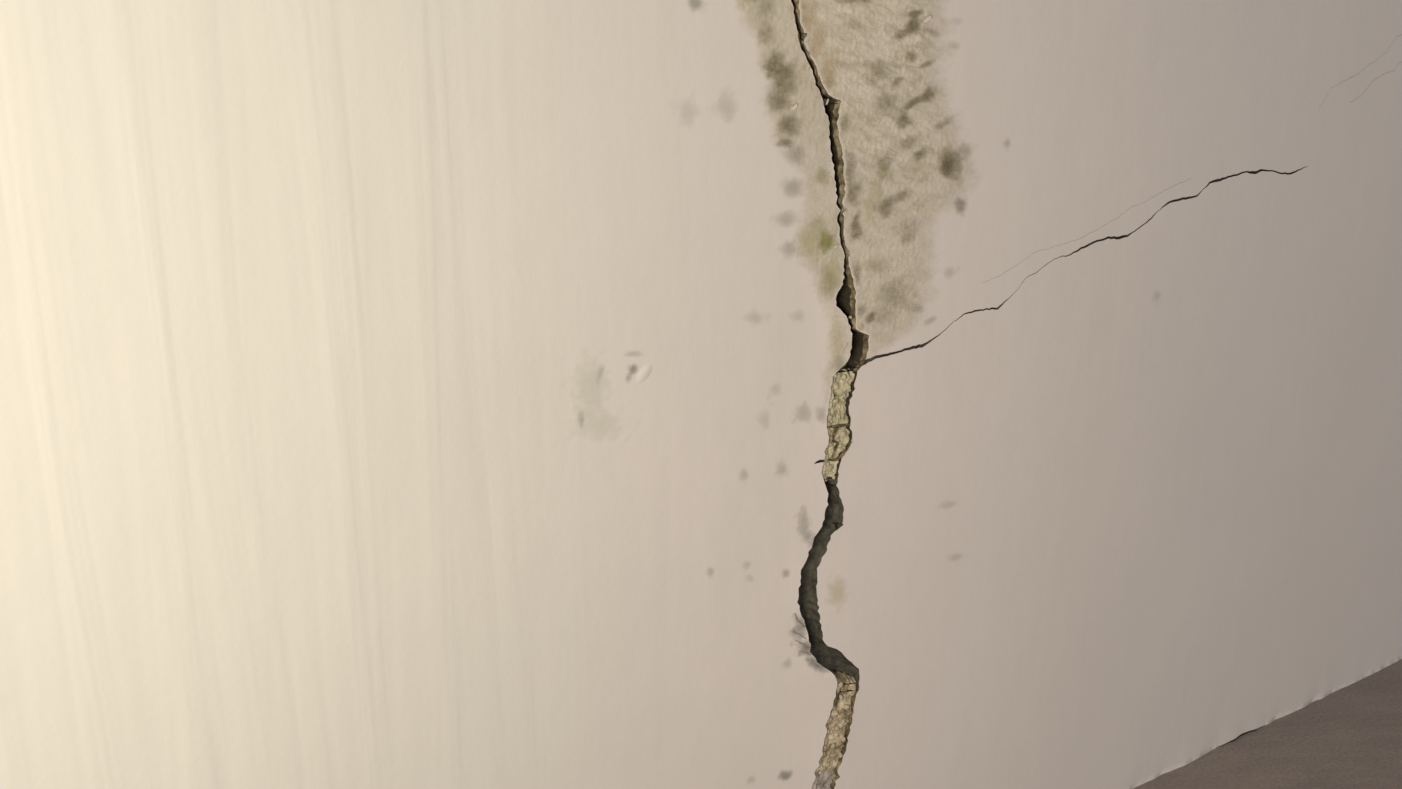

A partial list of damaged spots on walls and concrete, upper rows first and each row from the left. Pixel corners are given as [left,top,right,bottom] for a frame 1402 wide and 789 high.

damp [740,0,963,372]
crack [790,0,1307,789]